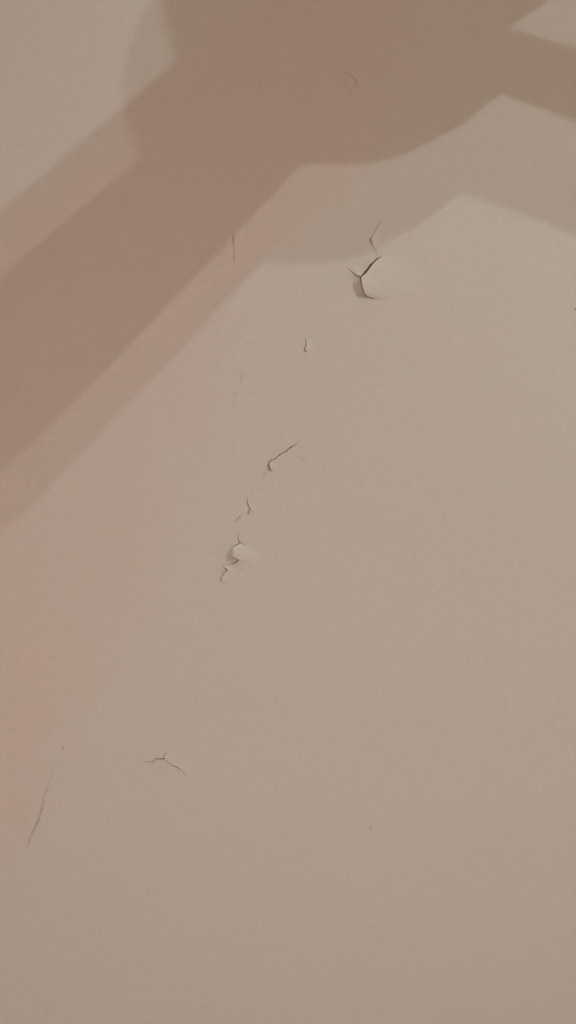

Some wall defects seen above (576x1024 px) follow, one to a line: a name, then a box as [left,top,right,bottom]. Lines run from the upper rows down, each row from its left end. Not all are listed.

crack [261,437,309,477]
peeling [220,533,260,584]